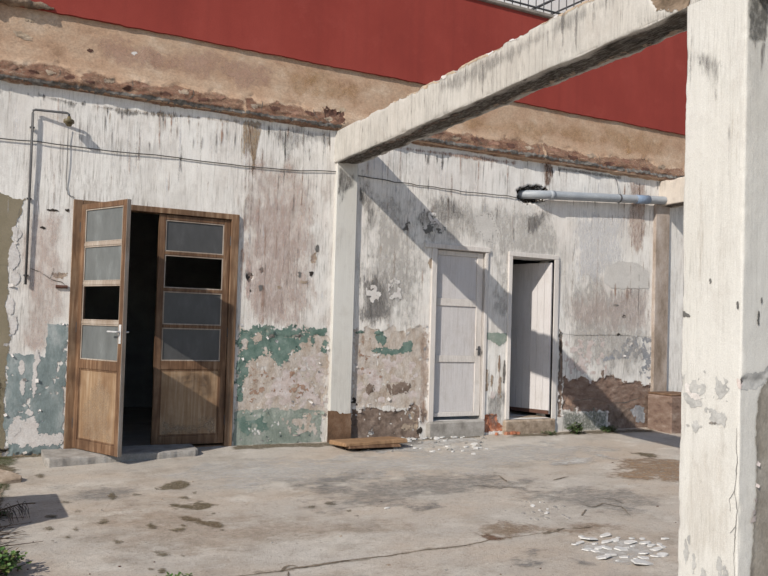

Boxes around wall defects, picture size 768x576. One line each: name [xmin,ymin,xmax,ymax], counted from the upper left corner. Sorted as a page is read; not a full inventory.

spalling [651,0,690,12]
spalling [394,0,594,103]
spalling [0,60,345,130]
leakage [420,191,456,234]
peeling [8,220,22,287]
leakage [362,276,402,322]
peeling [0,298,69,456]
spalling [232,323,503,455]
peeling [485,332,507,399]
spalling [557,329,651,429]
peeling [681,366,768,576]
peeling [571,533,669,565]